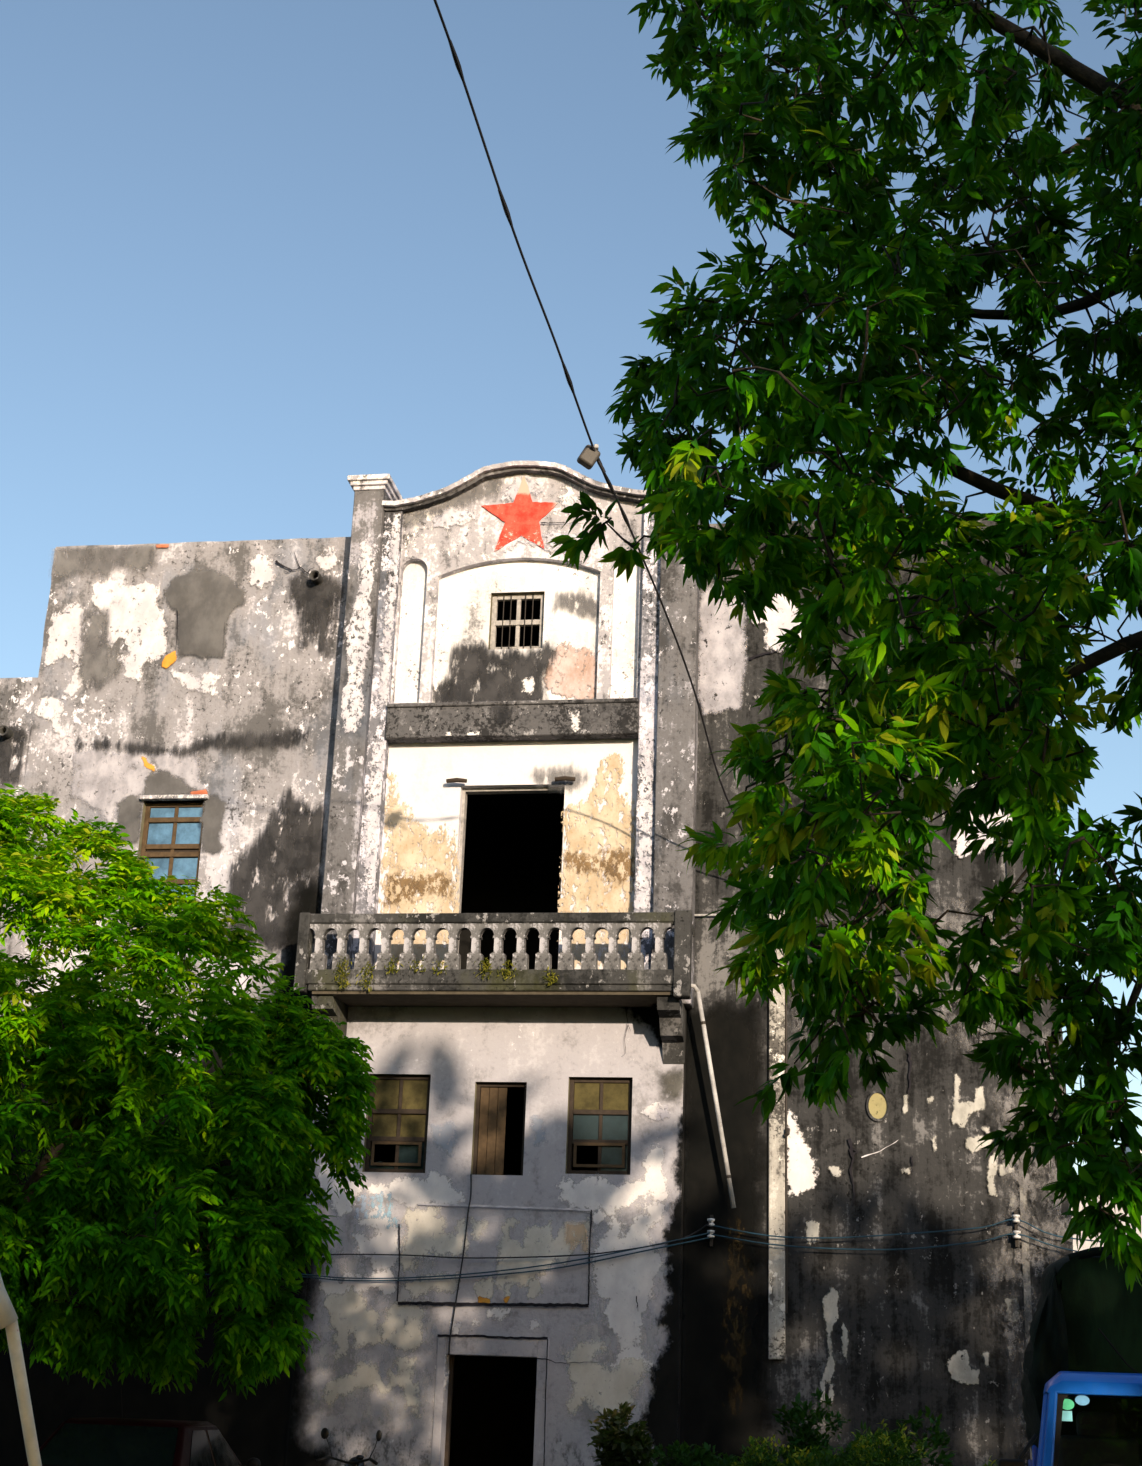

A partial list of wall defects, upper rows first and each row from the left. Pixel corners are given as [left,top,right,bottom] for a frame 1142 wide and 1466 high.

peeling [34,577,221,822]
leakage [289,571,344,657]
peeling [341,514,401,733]
leakage [433,642,555,726]
leakage [226,788,324,1020]
peeling [558,747,656,969]
peeling [787,1111,841,1196]
peeling [951,1074,1016,1207]
leakage [0,1214,434,1466]
peeling [317,1142,668,1421]
corrosion [721,1217,754,1414]
leakage [991,1146,1070,1389]